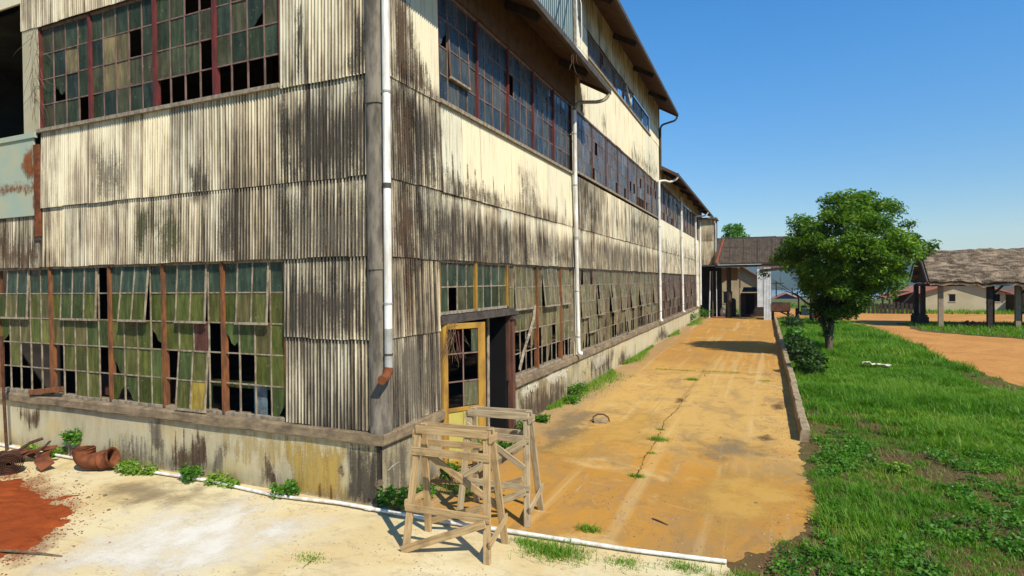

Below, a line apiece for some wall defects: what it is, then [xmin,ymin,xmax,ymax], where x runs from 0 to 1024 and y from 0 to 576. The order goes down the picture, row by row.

leakage [391,0,541,274]
leakage [95,143,128,206]
leakage [189,160,210,201]
leakage [218,202,241,262]
leakage [114,484,163,503]
leakage [122,421,407,505]